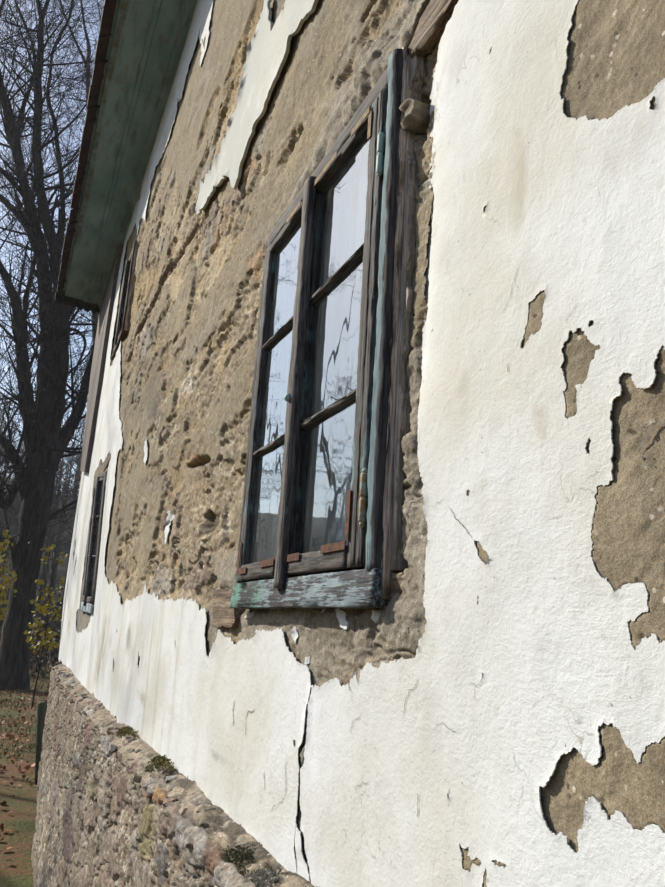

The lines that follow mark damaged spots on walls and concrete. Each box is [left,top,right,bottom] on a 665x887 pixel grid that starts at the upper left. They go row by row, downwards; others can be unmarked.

flaking render [560,0,665,120]
flaking render [97,0,441,687]
flaking render [521,291,545,348]
flaking render [561,320,600,418]
flaking render [592,346,665,649]
flaking render [73,517,92,633]
crack [260,682,315,874]
flaking render [540,723,665,853]
flaking render [460,846,487,887]